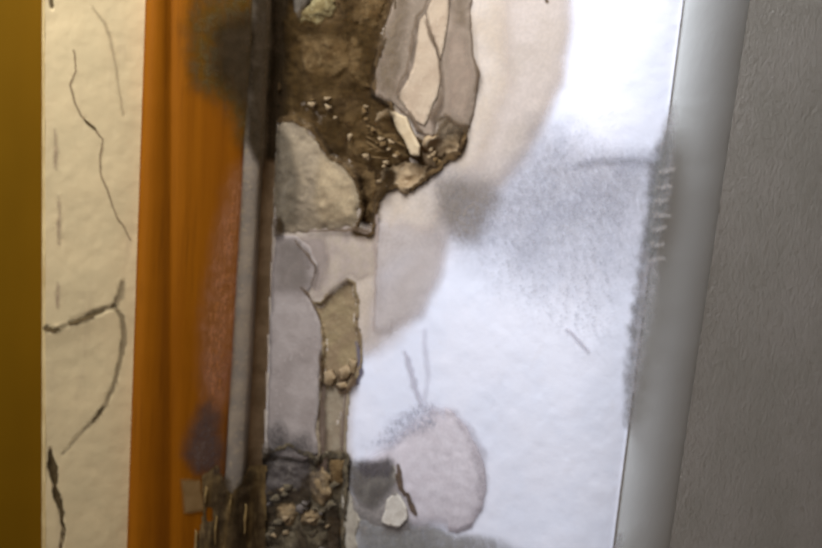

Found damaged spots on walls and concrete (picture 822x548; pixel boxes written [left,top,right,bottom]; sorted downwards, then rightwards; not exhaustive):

crack [43,281,126,454]
crack [70,50,131,240]
leakage [190,0,295,161]
hole [273,218,283,236]
flaking render [312,277,363,395]
flaking render [277,0,480,331]
leakage [269,0,640,349]
leakage [626,106,674,423]
flaking render [262,443,350,548]
leakage [349,460,497,548]